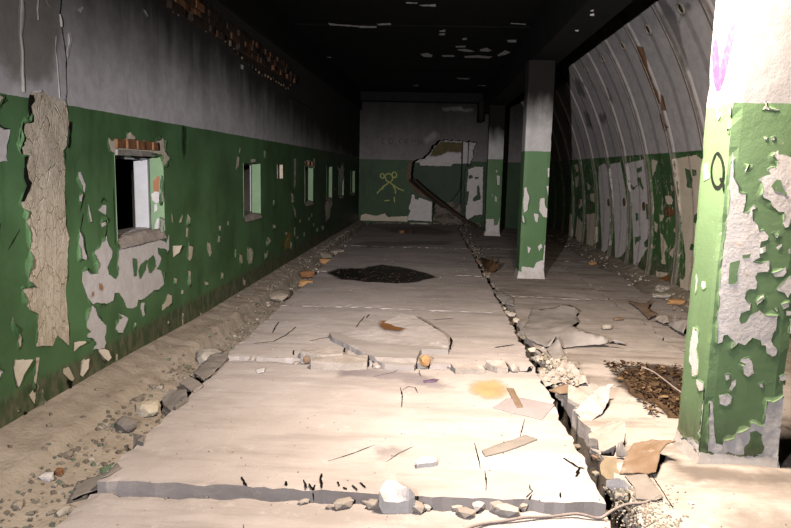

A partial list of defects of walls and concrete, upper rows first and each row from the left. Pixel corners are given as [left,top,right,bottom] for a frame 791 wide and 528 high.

crack [59,0,67,97]
rust [637,47,668,132]
crack [0,94,35,202]
crack [66,122,74,148]
spalling [0,89,193,382]
leakage [328,265,434,283]
peeling [359,153,502,232]
peeling [521,167,550,226]
peeling [568,151,711,295]
peeling [681,151,791,464]
crack [495,344,547,372]
crack [564,458,583,477]